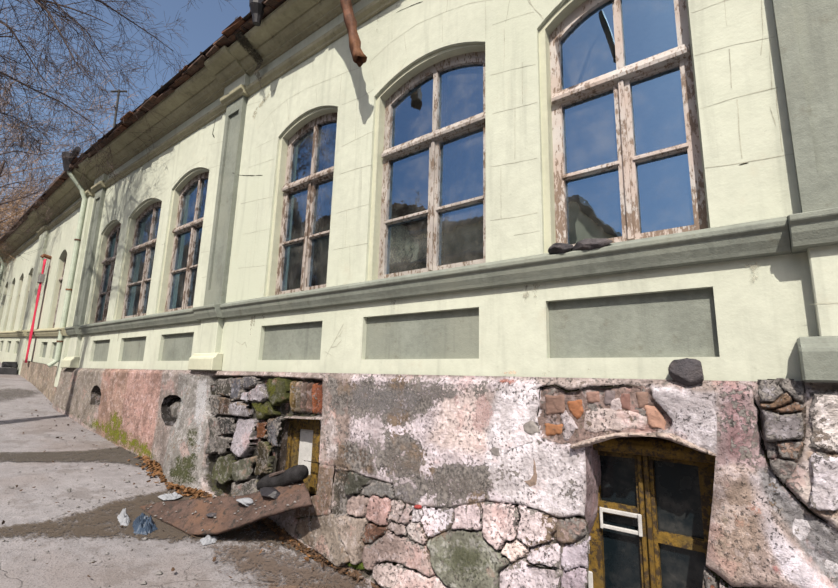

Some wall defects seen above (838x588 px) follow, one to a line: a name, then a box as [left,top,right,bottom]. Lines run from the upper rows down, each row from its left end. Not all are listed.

spalling [205,376,323,497]
spalling [523,386,672,444]
spalling [757,378,806,484]
spalling [295,470,591,588]
peeling [793,518,812,540]
peeling [824,559,838,574]